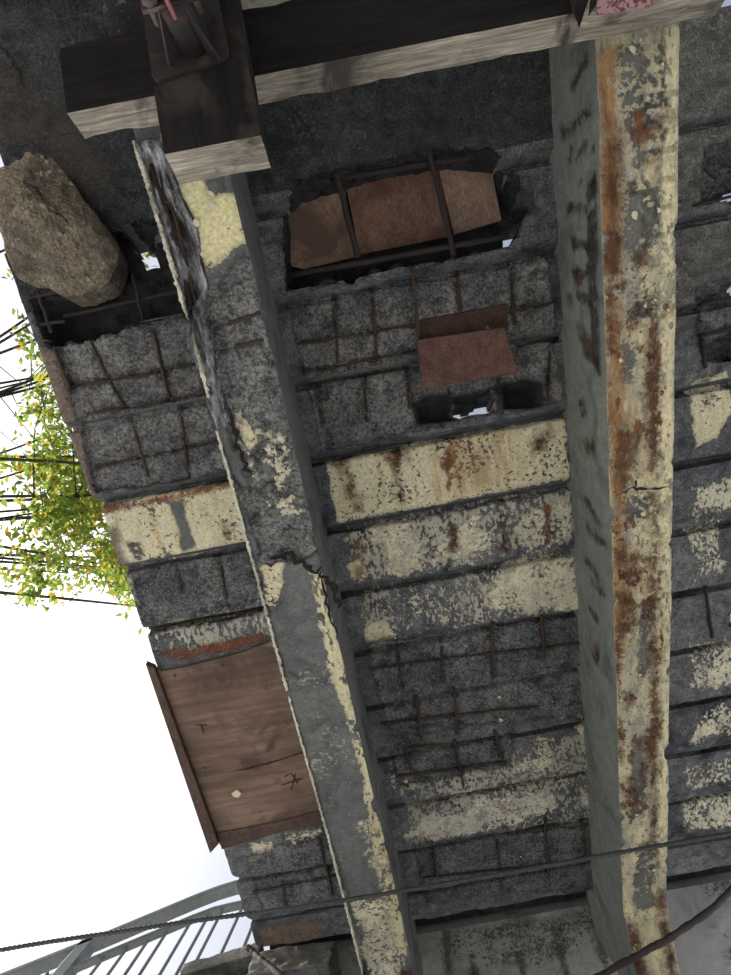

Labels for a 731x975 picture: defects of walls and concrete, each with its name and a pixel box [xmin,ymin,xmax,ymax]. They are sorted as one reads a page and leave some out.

damp [567,173,601,374]
corrosion [384,439,409,501]
corrosion [441,449,454,489]
corrosion [534,432,551,451]
corrosion [597,50,671,869]
peeling [616,23,731,911]
spalling [26,132,408,975]
spalling [283,141,593,904]
corrosion [544,505,552,542]
corrosion [627,925,646,975]
corrosion [656,891,675,975]